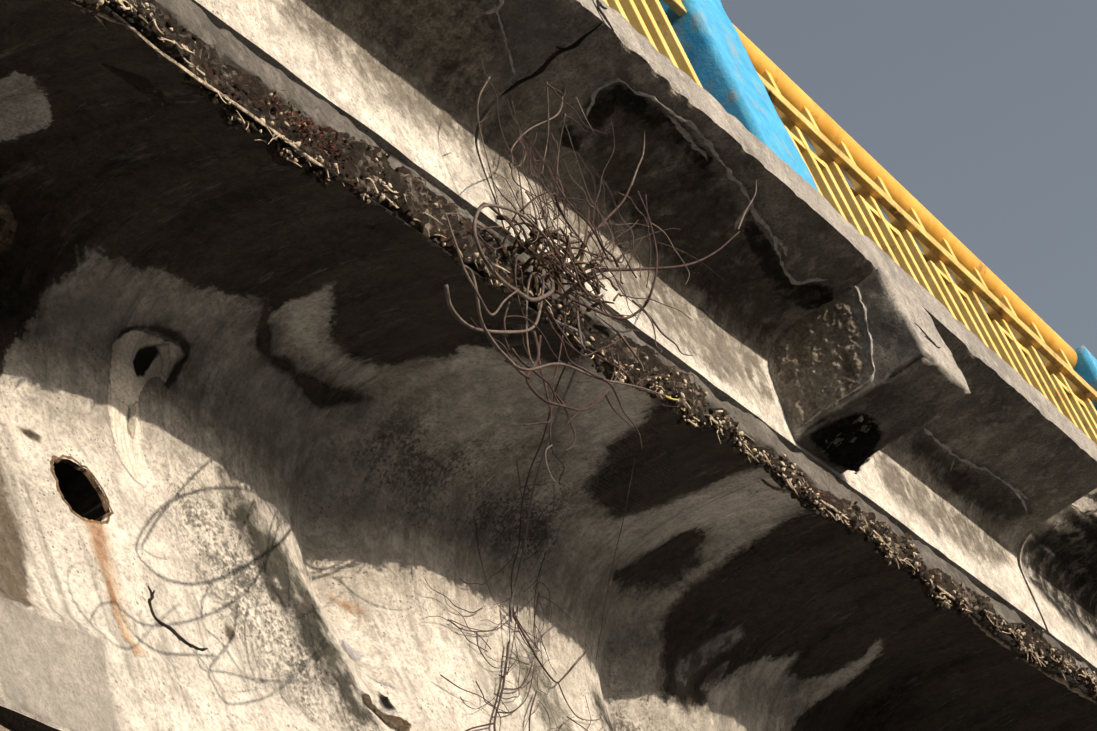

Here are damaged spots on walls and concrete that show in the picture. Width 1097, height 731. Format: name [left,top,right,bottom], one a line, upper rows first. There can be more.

peeling [0,70,55,142]
spalling [321,0,502,111]
crack [501,0,614,96]
spalling [21,428,40,440]
spalling [108,325,191,486]
water stain [360,417,573,556]
water stain [585,400,792,519]
spalling [773,300,881,474]
crack [147,585,208,651]
water stain [594,693,644,731]
peeling [675,627,744,691]
water stain [613,499,1097,731]